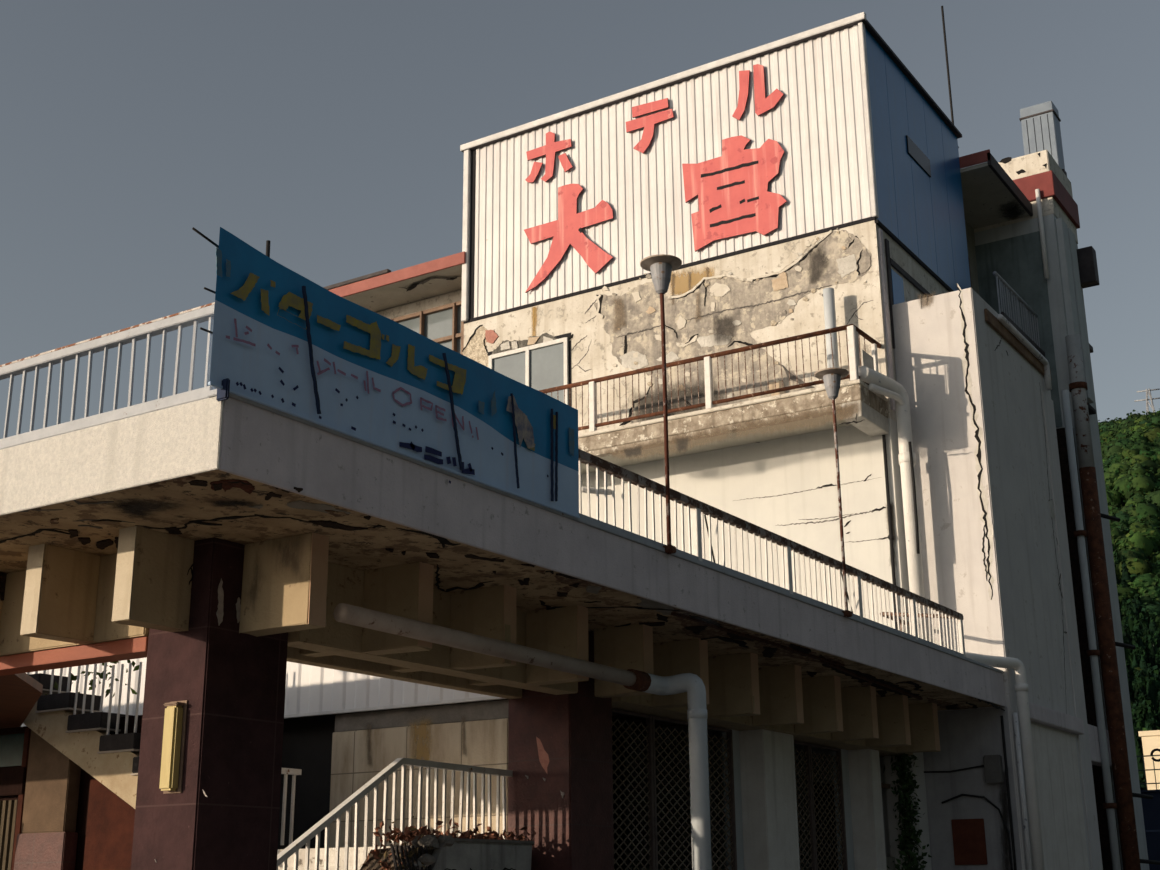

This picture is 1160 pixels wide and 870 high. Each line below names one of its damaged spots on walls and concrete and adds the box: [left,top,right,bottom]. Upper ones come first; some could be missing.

flaking render [462,325,573,367]
flaking render [594,228,872,426]
crack [956,283,1008,600]
peeling [216,578,241,625]
crack [0,500,639,627]
crack [734,474,888,542]
rust [1056,428,1106,727]
rust [1092,765,1122,870]